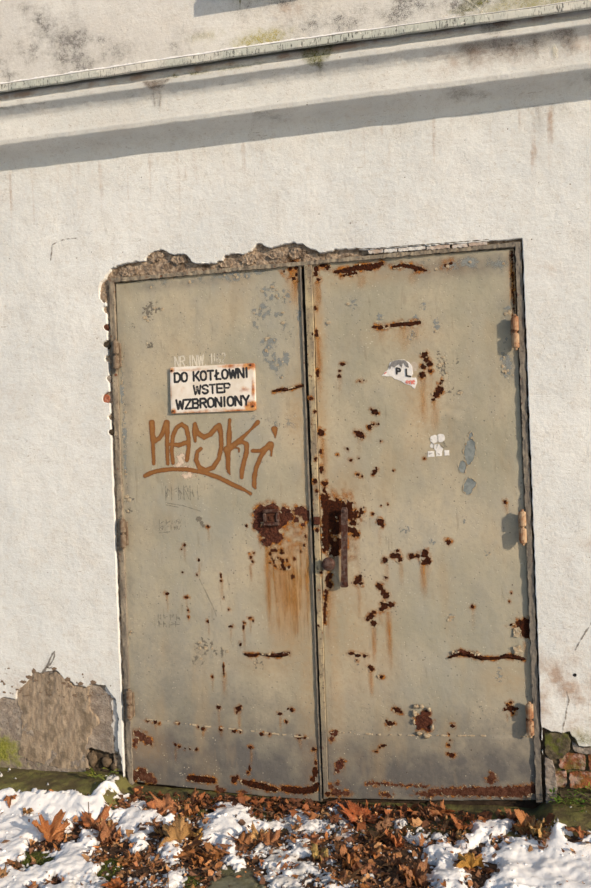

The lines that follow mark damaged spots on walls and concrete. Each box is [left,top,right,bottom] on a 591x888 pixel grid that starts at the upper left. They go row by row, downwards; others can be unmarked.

rust [313,259,427,283]
rust [418,351,445,401]
flaking render [0,239,524,777]
rust [245,426,389,605]
rust [317,571,334,627]
rust [365,772,536,800]
flaking render [540,722,591,804]